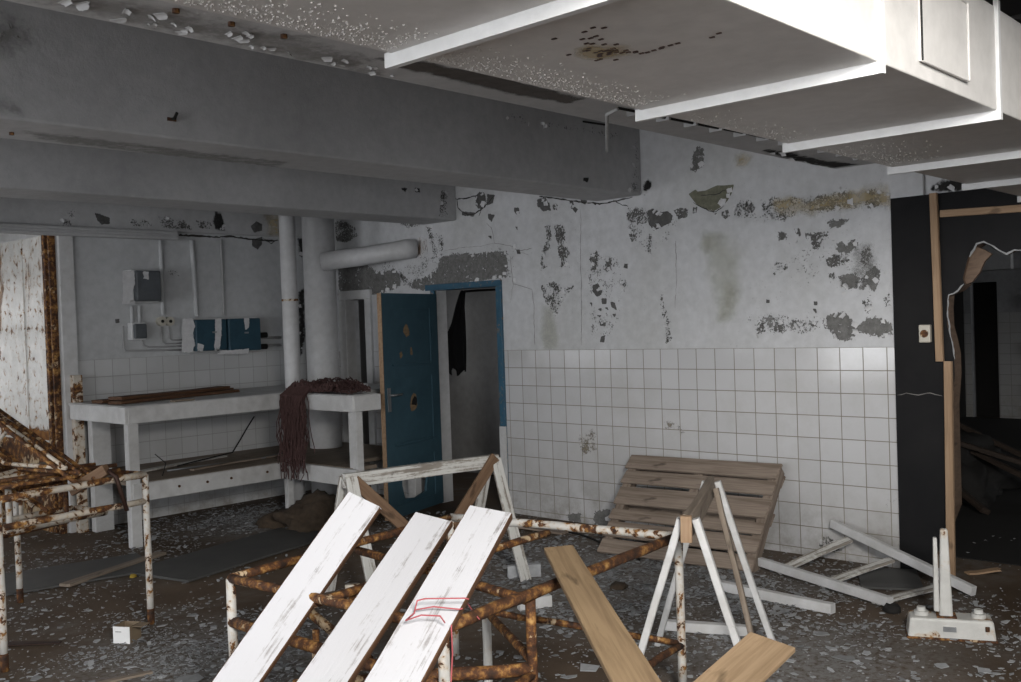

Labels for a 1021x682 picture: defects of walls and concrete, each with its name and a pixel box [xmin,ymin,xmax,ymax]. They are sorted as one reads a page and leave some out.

peeling [58,0,90,12]
peeling [147,12,194,35]
peeling [225,31,292,56]
rust [566,26,681,61]
peeling [690,146,705,172]
peeling [763,149,857,168]
peeling [462,192,495,222]
peeling [537,197,558,211]
peeling [338,223,521,299]
peeling [540,224,570,269]
peeling [541,281,574,315]
peeling [586,249,628,344]